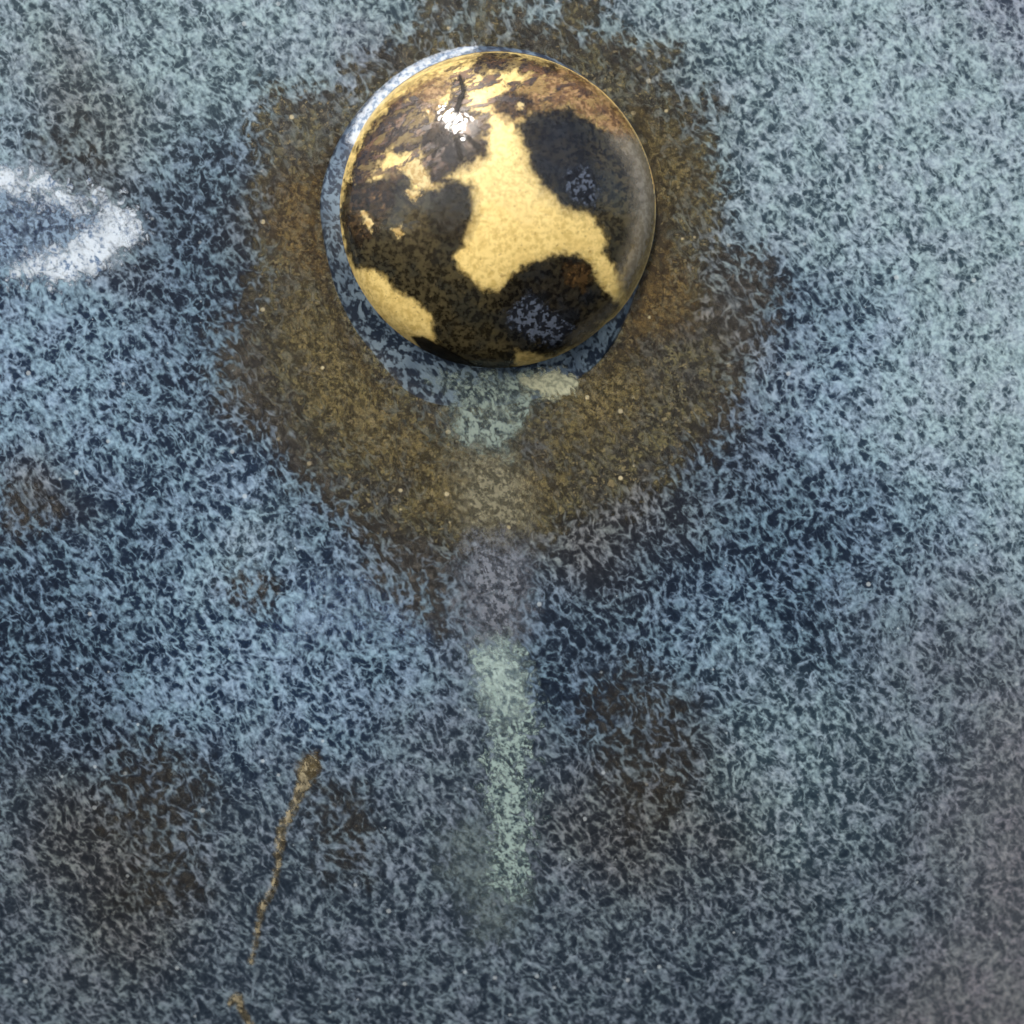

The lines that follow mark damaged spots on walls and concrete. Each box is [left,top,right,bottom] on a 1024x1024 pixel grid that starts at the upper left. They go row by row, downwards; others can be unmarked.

water stain [0,160,141,242]
rust [214,0,775,639]
water stain [441,367,579,925]